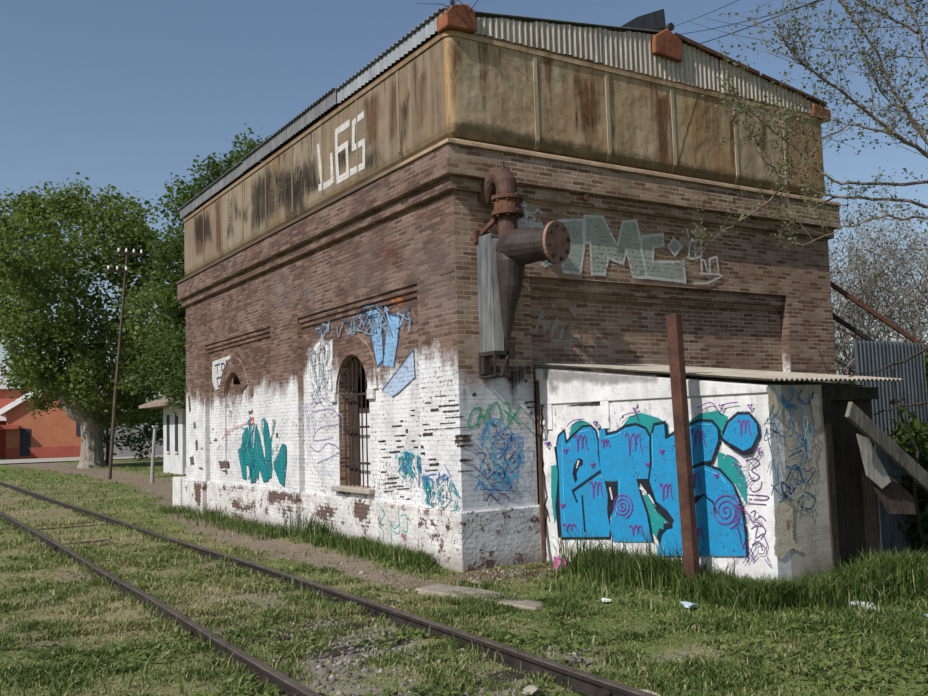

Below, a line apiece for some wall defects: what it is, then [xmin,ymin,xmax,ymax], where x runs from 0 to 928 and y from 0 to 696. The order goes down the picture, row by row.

corrosion [574,70,596,132]
corrosion [650,84,674,160]
water stain [227,164,317,234]
water stain [194,217,211,240]
peeling [767,388,782,419]
peeling [810,393,821,429]
peeling [218,477,257,520]
peeling [265,489,301,518]
peeling [317,492,370,528]
peeling [774,499,802,559]